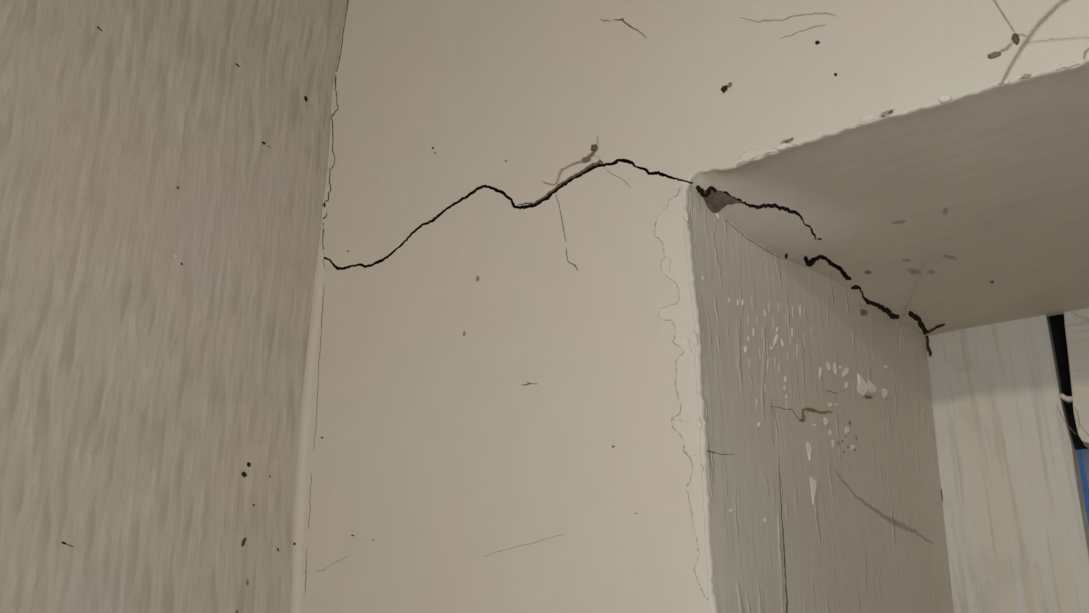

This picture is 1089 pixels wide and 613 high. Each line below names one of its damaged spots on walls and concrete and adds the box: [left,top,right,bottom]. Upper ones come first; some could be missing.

crack [314,0,945,439]
peeling [728,297,812,427]
peeling [813,362,888,453]